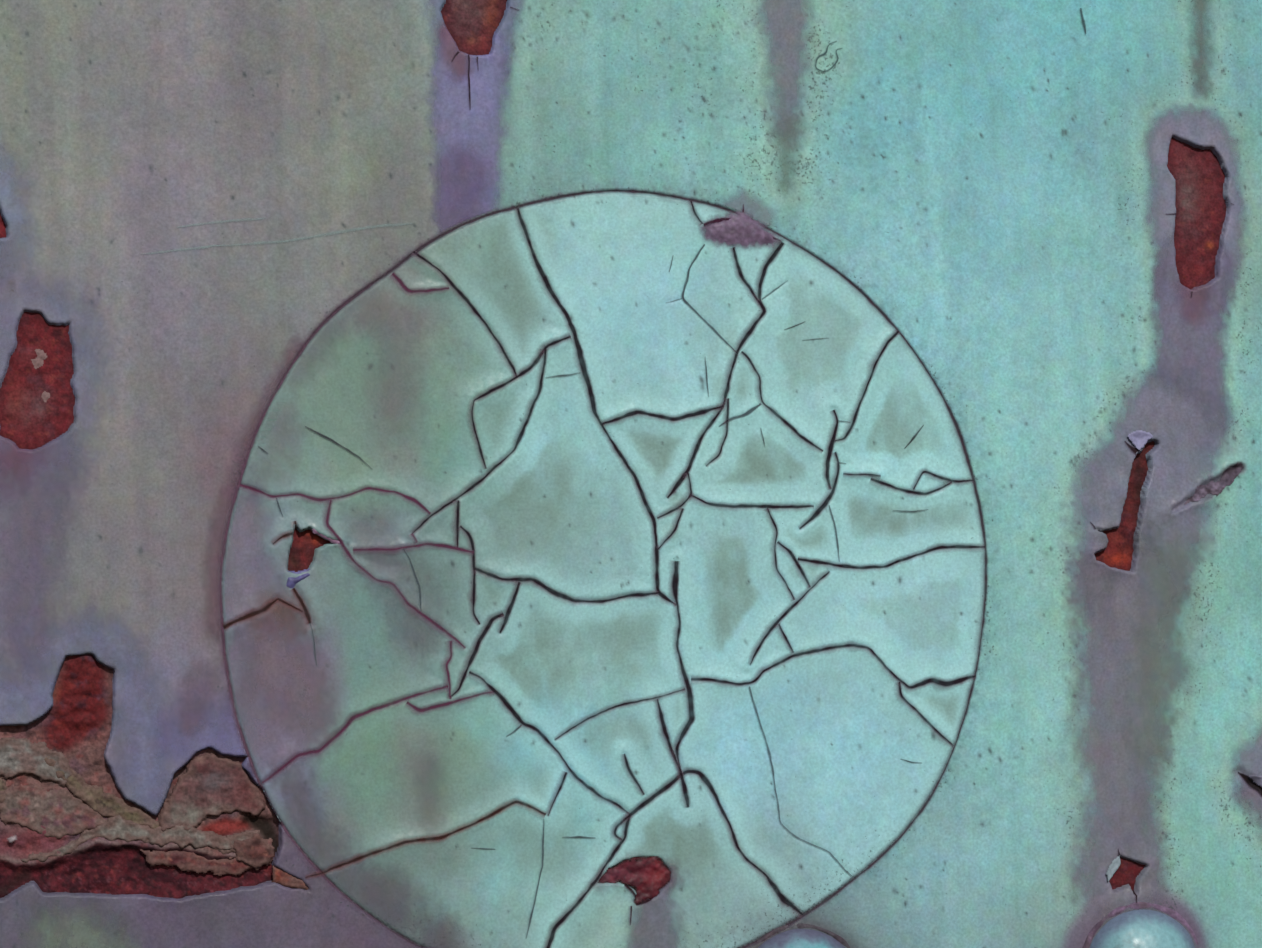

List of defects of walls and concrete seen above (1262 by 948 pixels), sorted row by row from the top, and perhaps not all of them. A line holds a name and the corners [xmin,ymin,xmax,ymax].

peeling [441,0,518,108]
peeling [1167,137,1232,297]
peeling [0,312,75,450]
crack [223,588,317,664]
peeling [288,528,340,572]
crack [240,201,985,948]
peeling [1091,430,1155,571]
spalling [1184,462,1244,504]
spalling [0,654,309,899]
peeling [1238,772,1262,796]
peeling [599,856,671,925]
peeling [1106,849,1145,902]